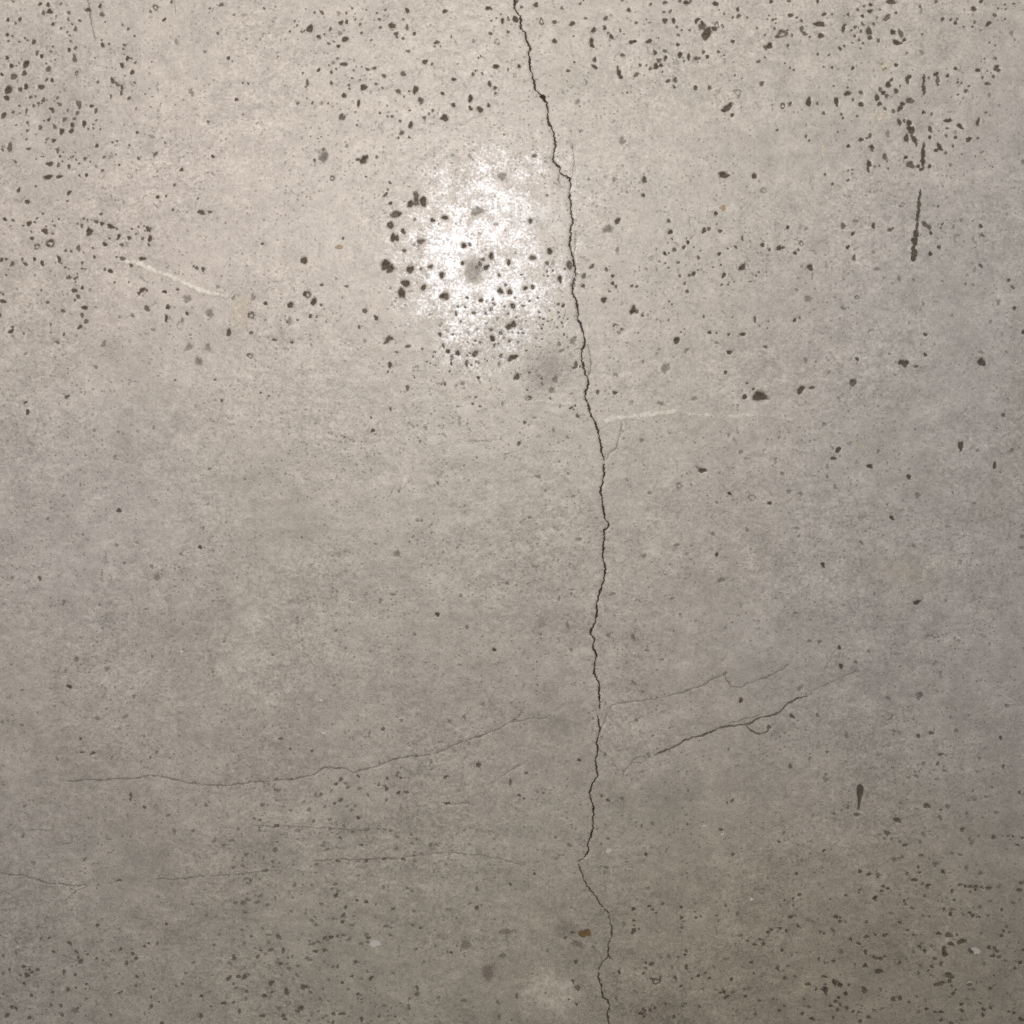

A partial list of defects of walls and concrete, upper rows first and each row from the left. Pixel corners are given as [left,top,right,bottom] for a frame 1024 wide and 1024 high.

crack [513,0,613,1024]
crack [657,696,807,754]